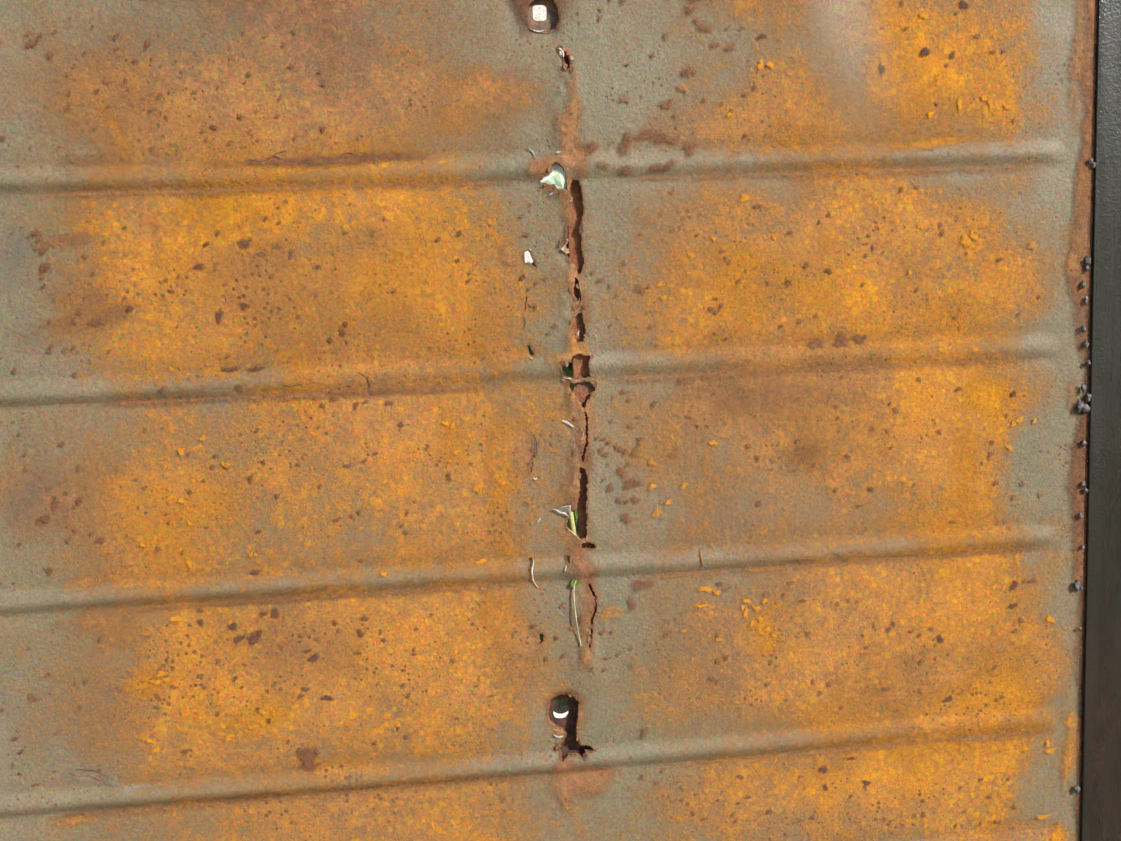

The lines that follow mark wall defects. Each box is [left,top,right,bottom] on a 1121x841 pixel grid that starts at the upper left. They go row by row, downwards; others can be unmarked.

crack [557,45,574,73]
corrosion [0,0,595,841]
crack [553,178,597,551]
corrosion [621,0,1097,841]
crack [586,582,598,649]
corrosion [567,530,619,669]
corrosion [553,761,613,810]